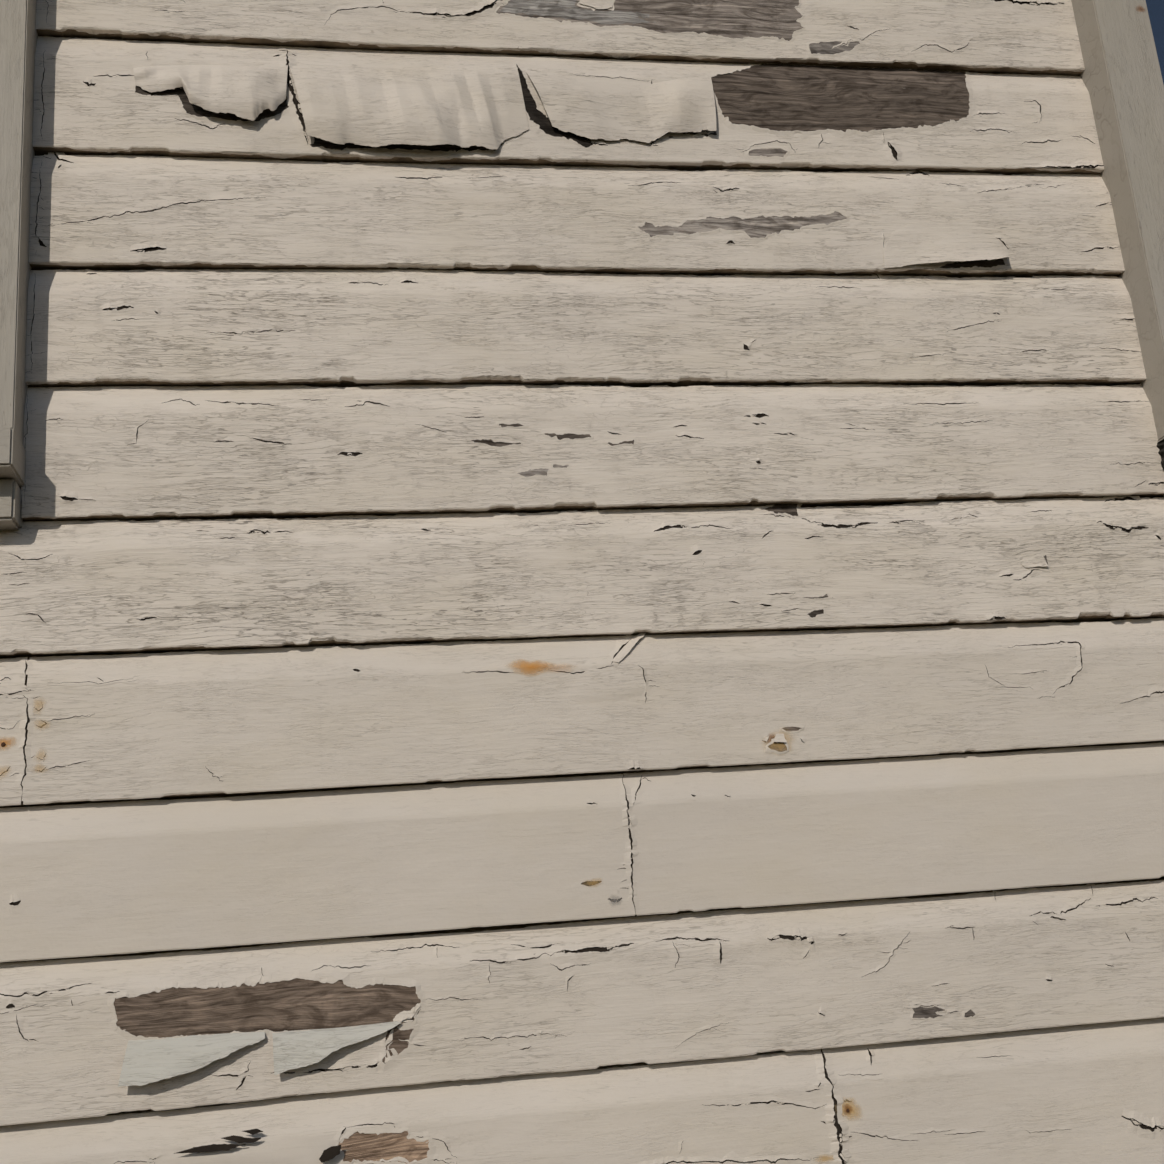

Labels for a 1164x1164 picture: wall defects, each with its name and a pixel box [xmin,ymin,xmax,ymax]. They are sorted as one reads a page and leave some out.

peeling [79,0,975,160]
peeling [635,208,850,242]
peeling [871,220,1012,280]
crack [1095,298,1164,549]
corrosion [462,661,614,679]
crack [983,610,1087,701]
crack [0,659,141,801]
crack [371,773,729,1004]
peeling [0,960,426,1094]
peeling [336,1118,461,1164]
crack [637,1047,986,1164]
crack [1119,1108,1164,1140]